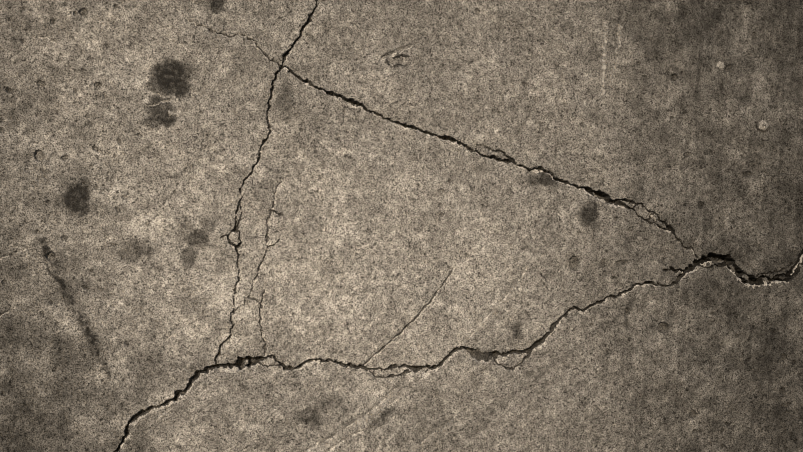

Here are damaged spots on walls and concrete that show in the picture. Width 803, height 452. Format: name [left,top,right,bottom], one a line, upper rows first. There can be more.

crack [220,0,700,305]
crack [114,249,803,452]